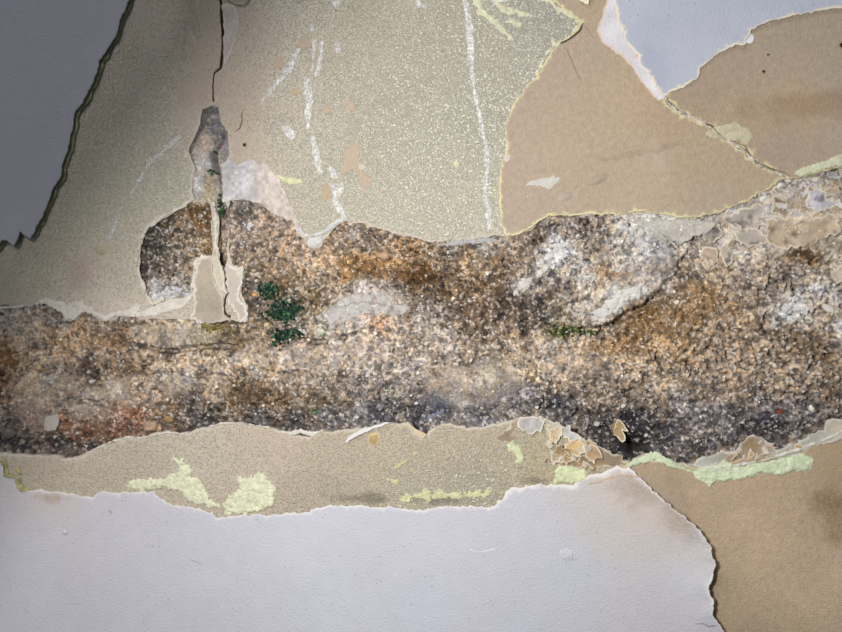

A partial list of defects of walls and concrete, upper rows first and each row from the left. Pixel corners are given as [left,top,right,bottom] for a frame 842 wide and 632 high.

spalling [136,105,229,305]
crack [212,0,224,102]
crack [222,267,230,318]
peeling [499,0,842,236]
crack [667,98,791,180]
spalling [0,158,842,632]